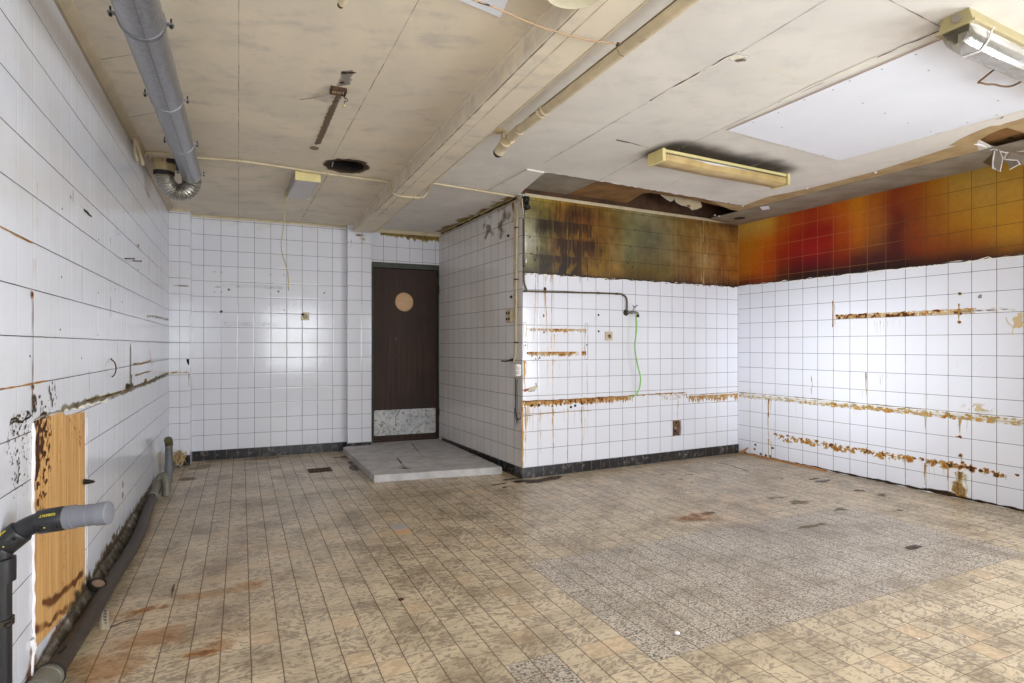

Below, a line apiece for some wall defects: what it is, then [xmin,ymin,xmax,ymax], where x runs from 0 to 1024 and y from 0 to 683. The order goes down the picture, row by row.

peeling [706,118,1024,211]
corrosion [523,274,588,383]
corrosion [832,292,1007,327]
damp [8,382,56,509]
corrosion [521,372,1023,474]
corrosion [754,432,1019,500]